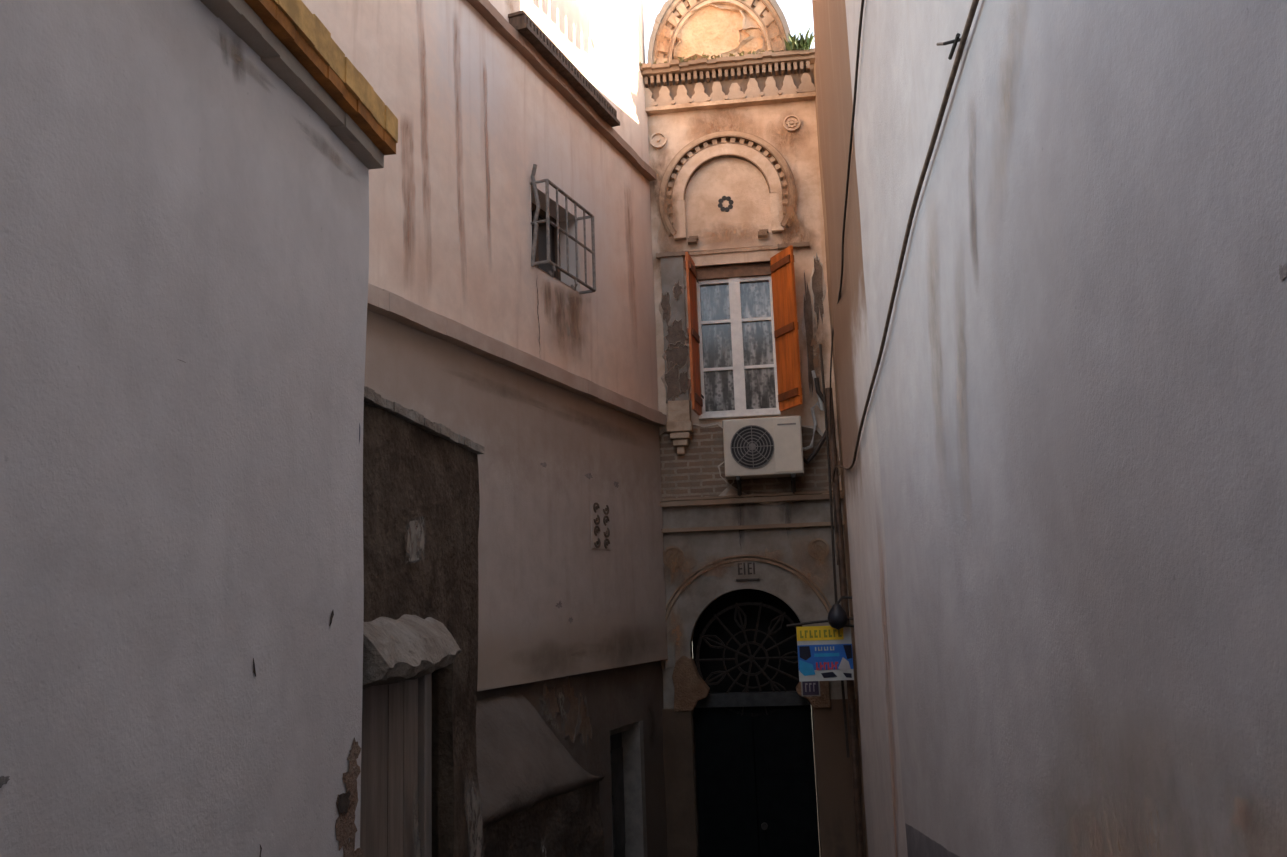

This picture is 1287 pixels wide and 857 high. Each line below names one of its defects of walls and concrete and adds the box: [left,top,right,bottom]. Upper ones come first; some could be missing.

spalling [672,4,767,63]
spalling [659,280,691,401]
spalling [335,737,363,857]